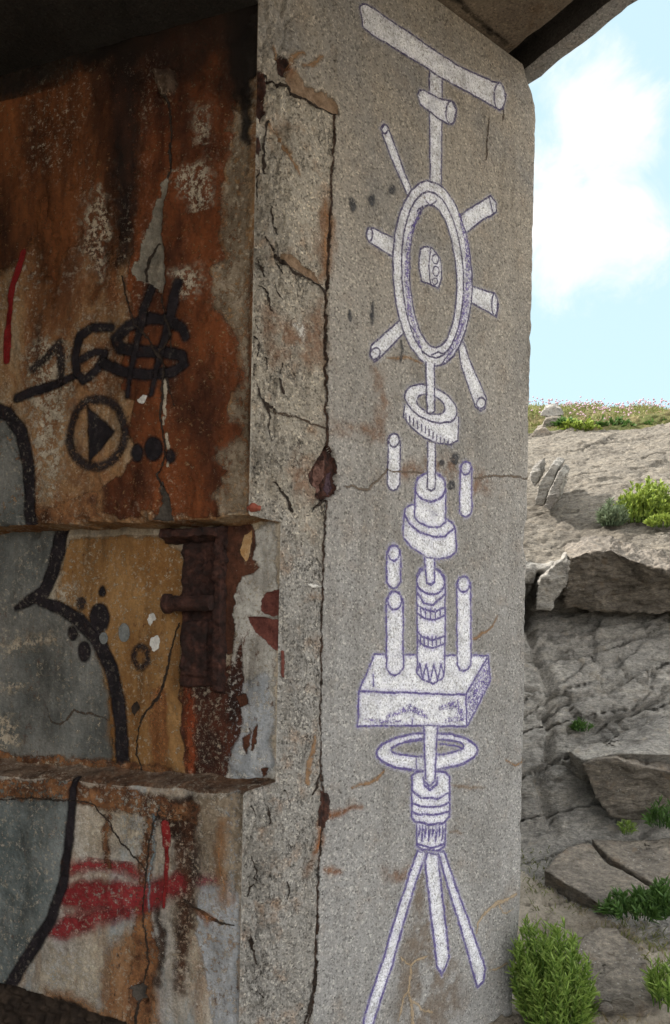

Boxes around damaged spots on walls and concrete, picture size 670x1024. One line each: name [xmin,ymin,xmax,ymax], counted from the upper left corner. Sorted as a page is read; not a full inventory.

spalling [131,178,169,293]
flaking render [211,71,339,514]
crack [258,115,336,451]
corrosion [0,53,259,1024]
crack [183,899,235,926]
flaking render [194,521,285,1024]
crack [304,826,324,1024]
crack [274,464,528,795]